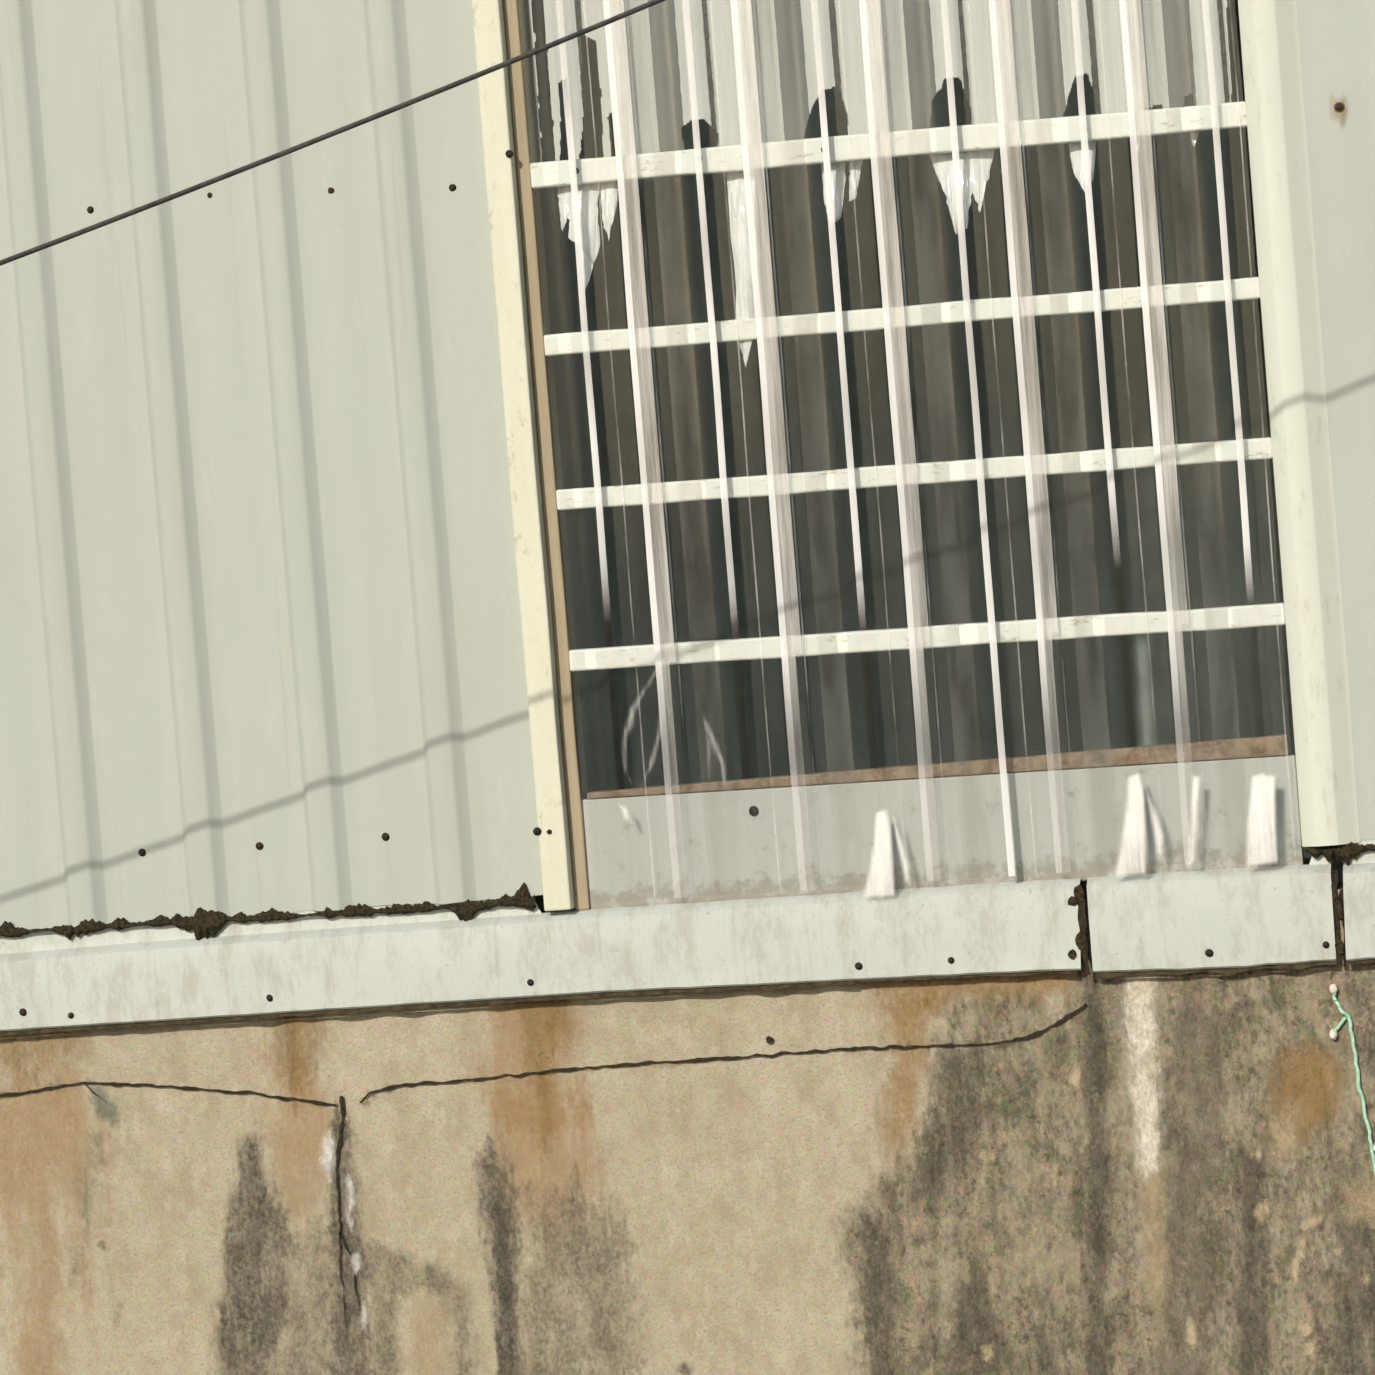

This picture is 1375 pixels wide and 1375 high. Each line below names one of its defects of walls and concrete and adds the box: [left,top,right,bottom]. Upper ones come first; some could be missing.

water stain [219,1108,406,1375]
crack [0,1003,1087,1347]
water stain [479,1149,630,1375]
water stain [845,955,1375,1375]